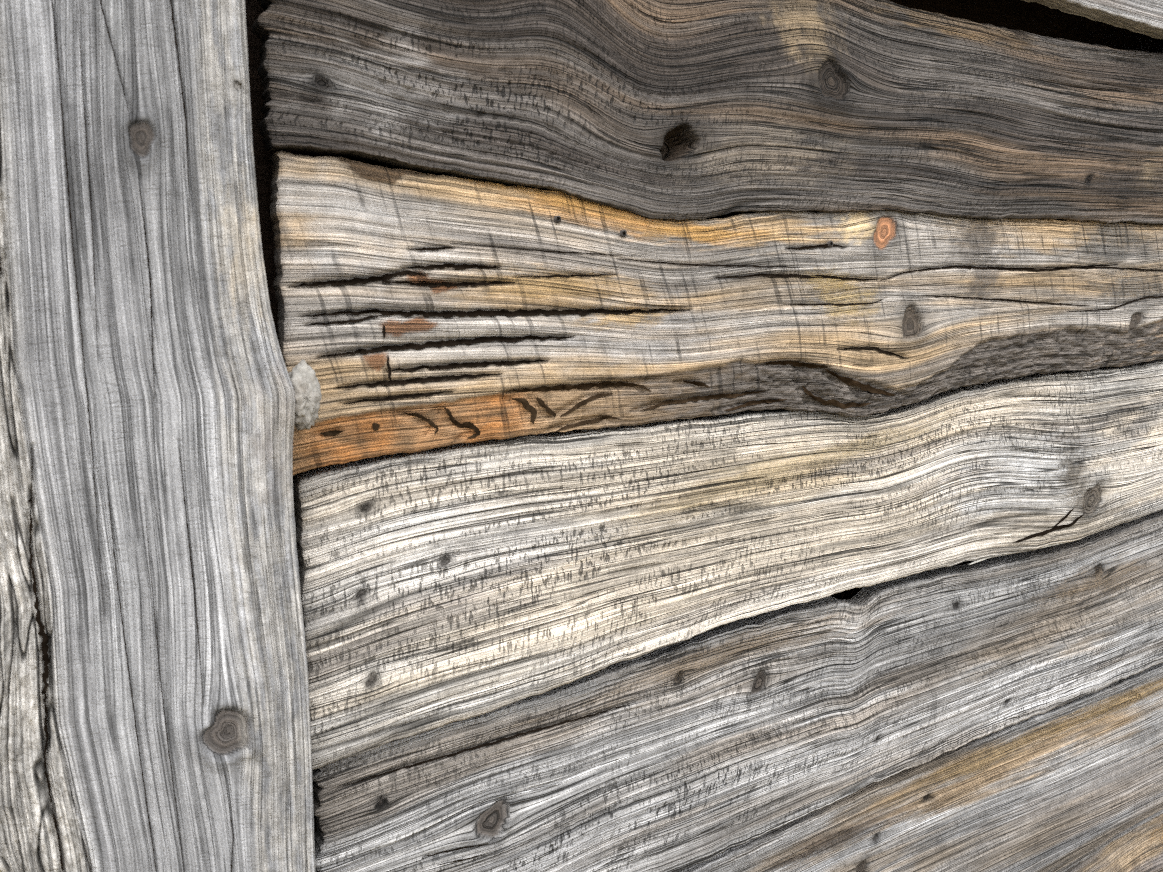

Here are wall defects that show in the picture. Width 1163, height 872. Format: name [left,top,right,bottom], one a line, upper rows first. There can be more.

crack [292,243,1163,404]
crack [1013,507,1085,543]